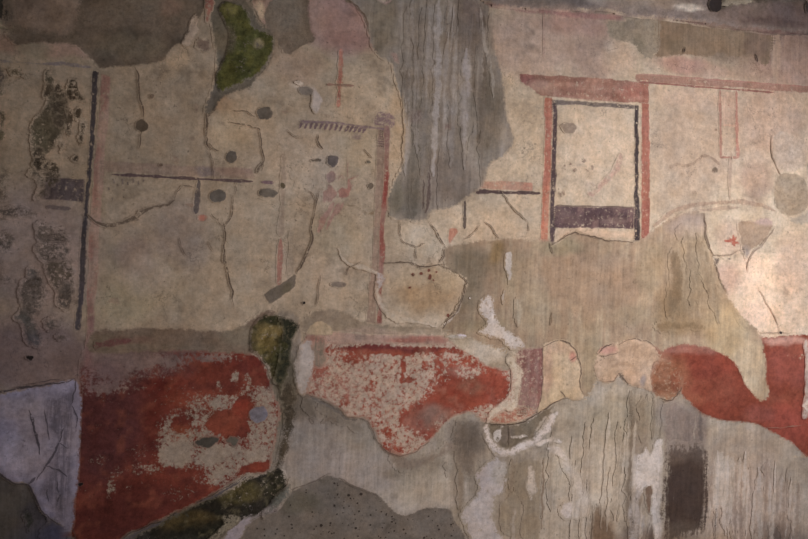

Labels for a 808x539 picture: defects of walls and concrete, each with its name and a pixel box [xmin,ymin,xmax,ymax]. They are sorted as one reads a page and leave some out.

crack [204,108,265,180]
flaking render [203,0,276,116]
damp [400,0,503,218]
crack [87,185,193,229]
crack [208,182,237,306]
crack [387,221,468,329]
damp [653,223,749,334]
flaking render [85,273,664,539]
damp [337,248,802,539]
flaking render [0,477,47,539]
damp [221,517,252,539]
flaking render [679,394,808,539]